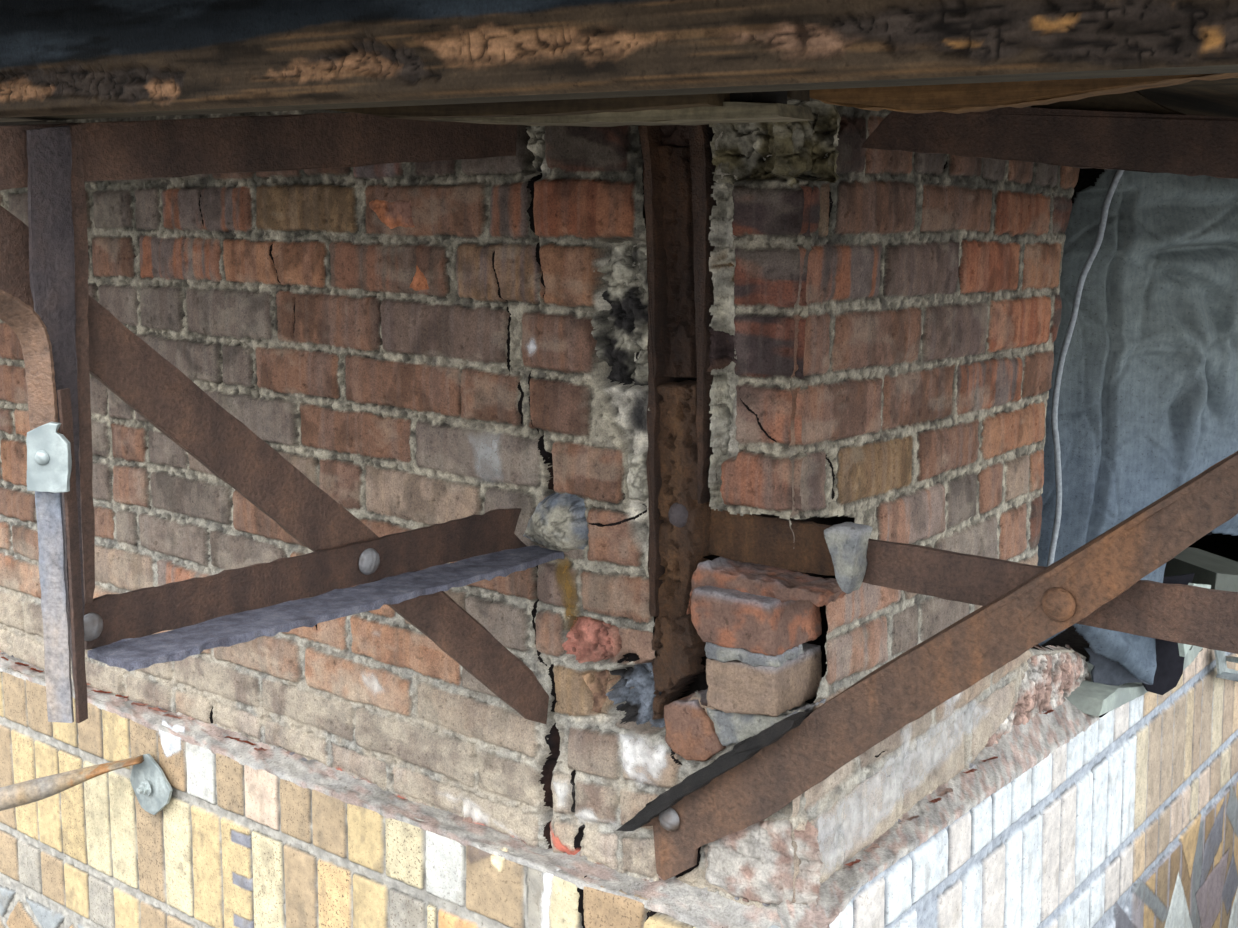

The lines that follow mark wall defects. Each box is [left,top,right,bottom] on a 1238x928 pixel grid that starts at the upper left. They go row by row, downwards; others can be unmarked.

crack [526,173,546,298]
crack [492,251,554,490]
spalling [562,616,826,762]
spalling [962,644,1091,773]
spalling [705,819,823,907]
peeling [845,843,880,866]